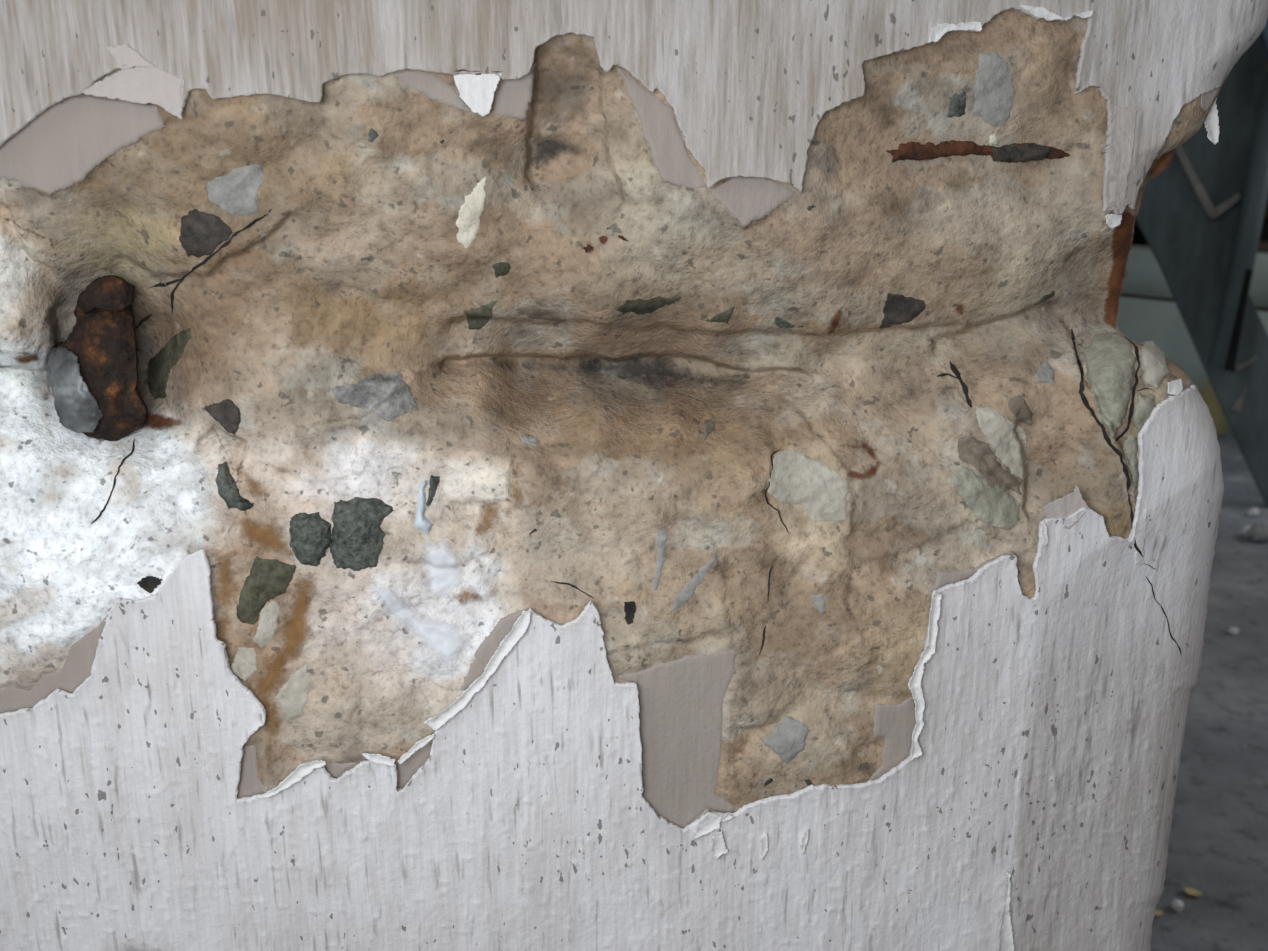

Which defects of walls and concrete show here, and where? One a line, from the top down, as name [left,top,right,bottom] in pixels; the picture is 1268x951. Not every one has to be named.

peeling [1021,5,1073,21]
corrosion [1150,151,1174,177]
spalling [1124,87,1221,249]
crack [135,214,268,329]
corrosion [1104,211,1135,327]
spalling [0,8,1194,813]
water stain [553,357,716,383]
crack [1071,329,1181,653]